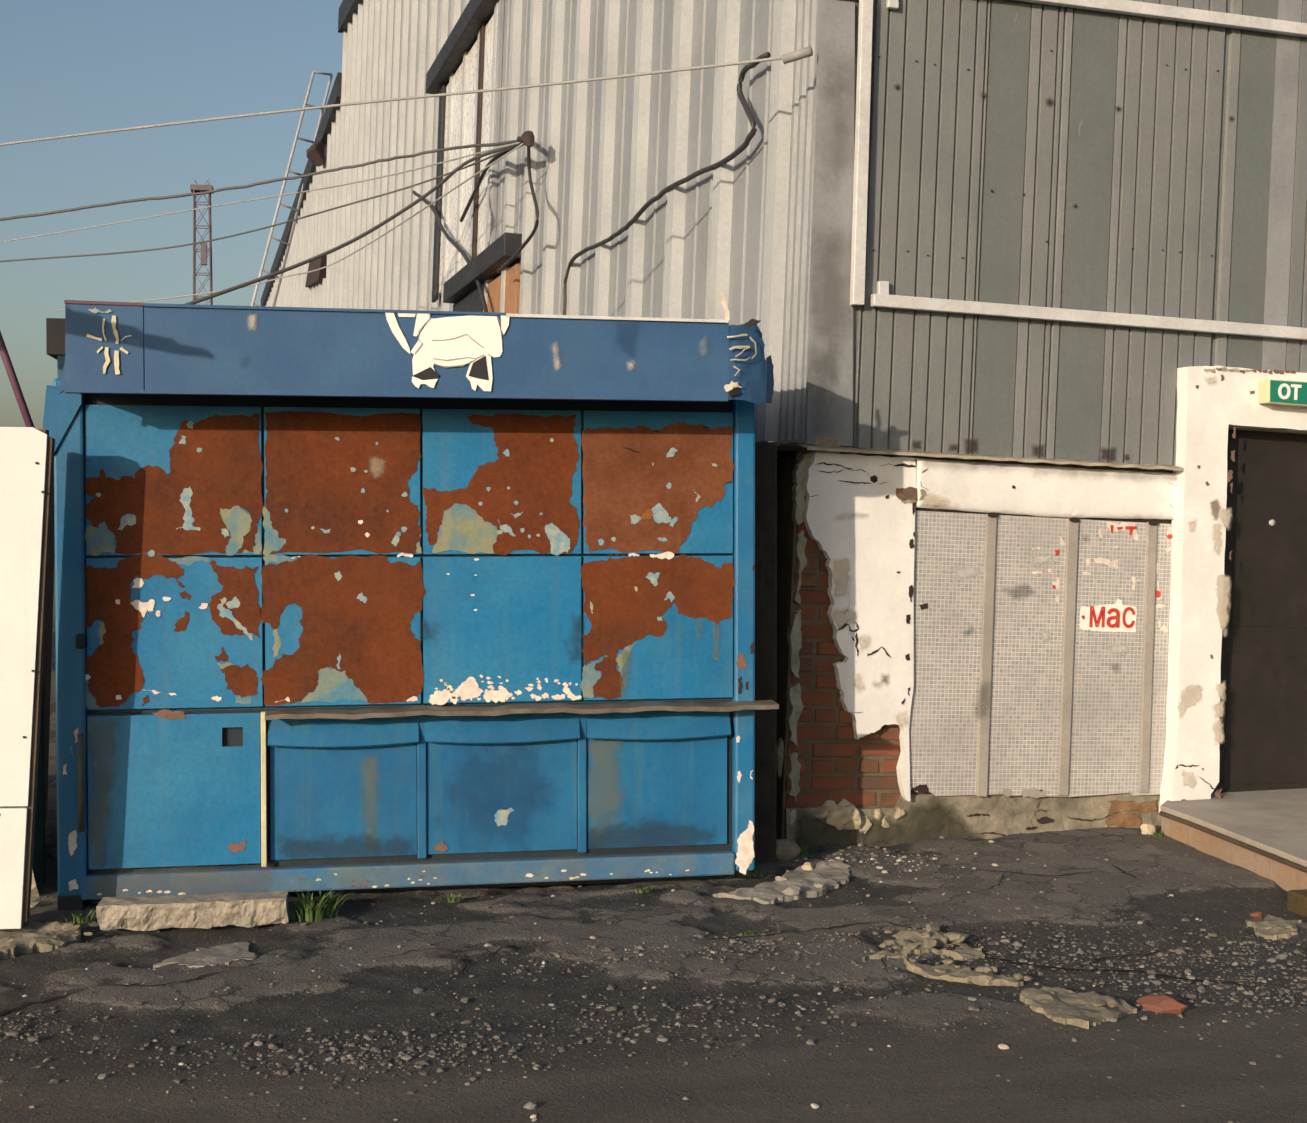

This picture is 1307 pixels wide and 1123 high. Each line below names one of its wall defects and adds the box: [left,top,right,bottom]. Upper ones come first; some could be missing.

crack [811,461,928,497]
spalling [1197,426,1236,560]
rust [84,411,734,709]
peeling [1217,575,1230,633]
flaking render [785,451,929,824]
crack [837,609,891,657]
peeling [428,674,582,705]
peeling [1179,686,1201,716]
peeling [1213,684,1225,743]
peeling [1181,768,1204,801]
peeling [735,820,755,875]